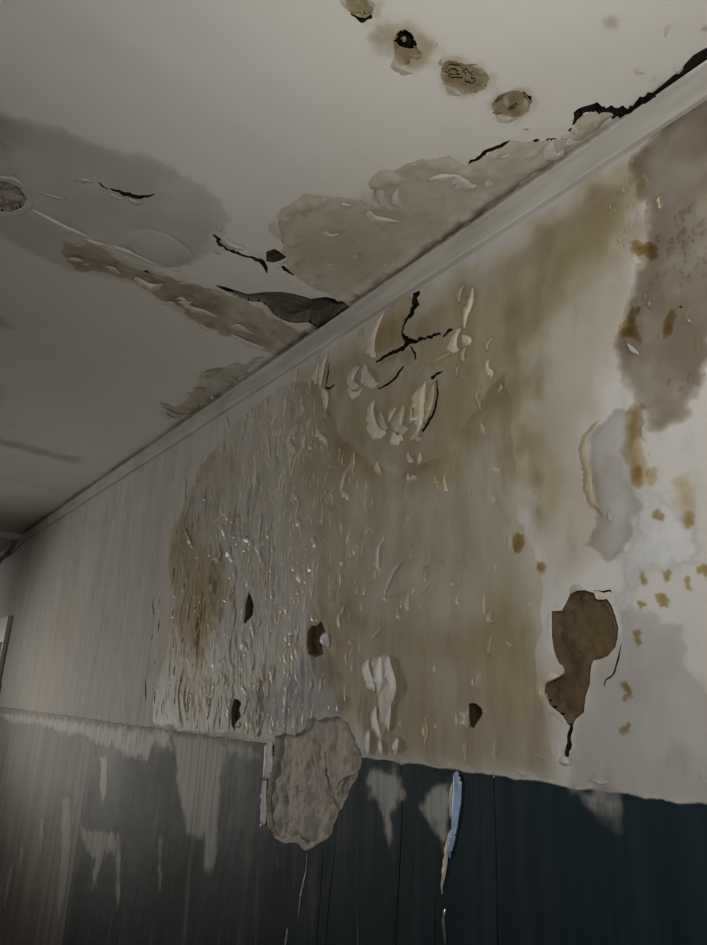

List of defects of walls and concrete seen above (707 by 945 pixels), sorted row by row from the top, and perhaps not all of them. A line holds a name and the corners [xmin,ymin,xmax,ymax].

hole [340,0,374,23]
hole [390,29,423,76]
hole [438,59,489,96]
spalling [489,90,532,123]
peeling [0,170,348,420]
crack [376,290,453,389]
peeling [608,143,707,359]
crack [422,371,442,432]
peeling [153,284,621,889]
efflorescence [616,489,697,604]
leakage [56,795,71,922]